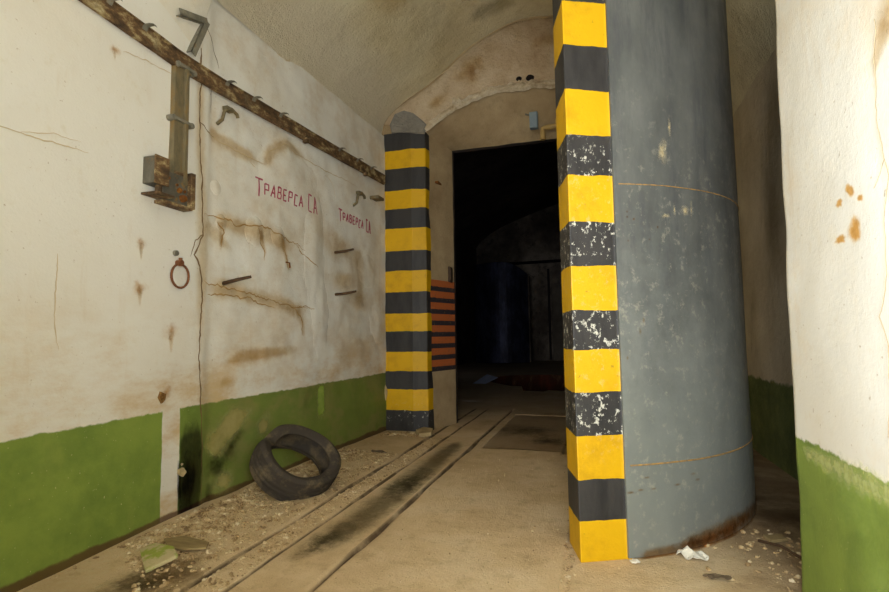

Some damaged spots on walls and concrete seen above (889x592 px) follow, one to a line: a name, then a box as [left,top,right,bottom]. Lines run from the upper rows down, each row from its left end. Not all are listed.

crack [0,126,88,153]
crack [873,19,889,378]
leakage [207,215,318,269]
crack [190,30,354,504]
leakage [206,282,314,335]